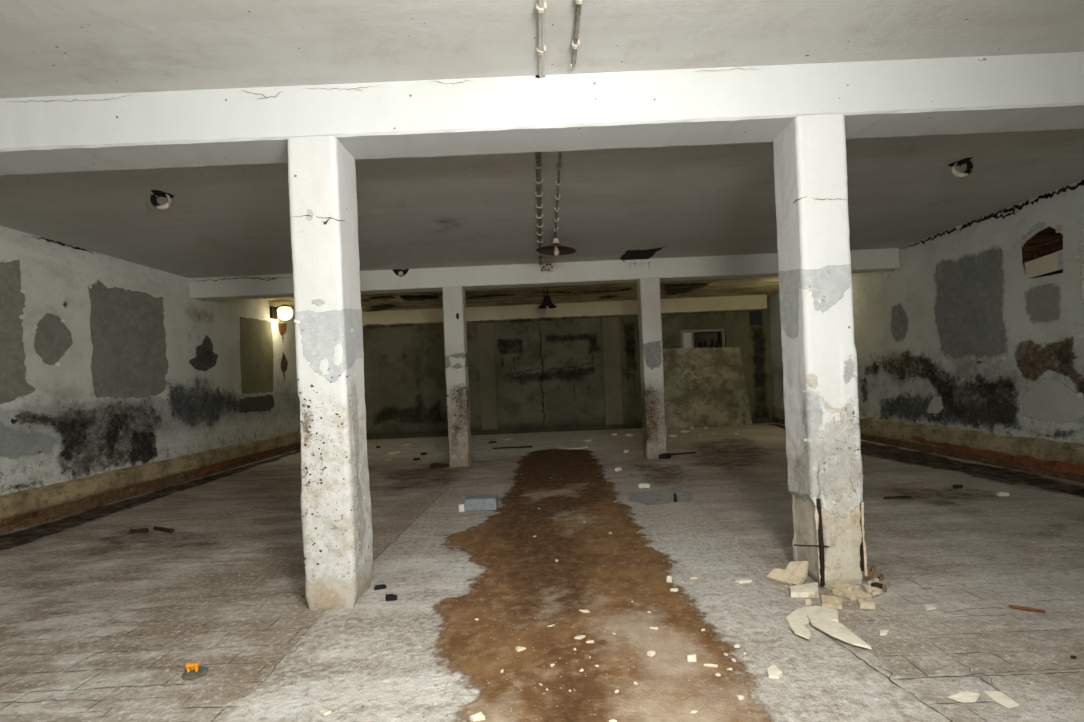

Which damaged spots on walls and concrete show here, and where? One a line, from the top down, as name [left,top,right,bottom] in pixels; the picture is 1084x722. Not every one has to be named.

crack [900,180,1084,249]
peeling [0,260,73,404]
damp [31,335,274,478]
peeling [293,299,414,491]
damp [374,380,444,424]
crack [505,323,591,425]
damp [498,333,600,389]
damp [752,328,768,418]
peeling [778,264,851,339]
damp [859,333,1084,435]
spalling [1021,223,1065,322]
spalling [794,355,868,588]